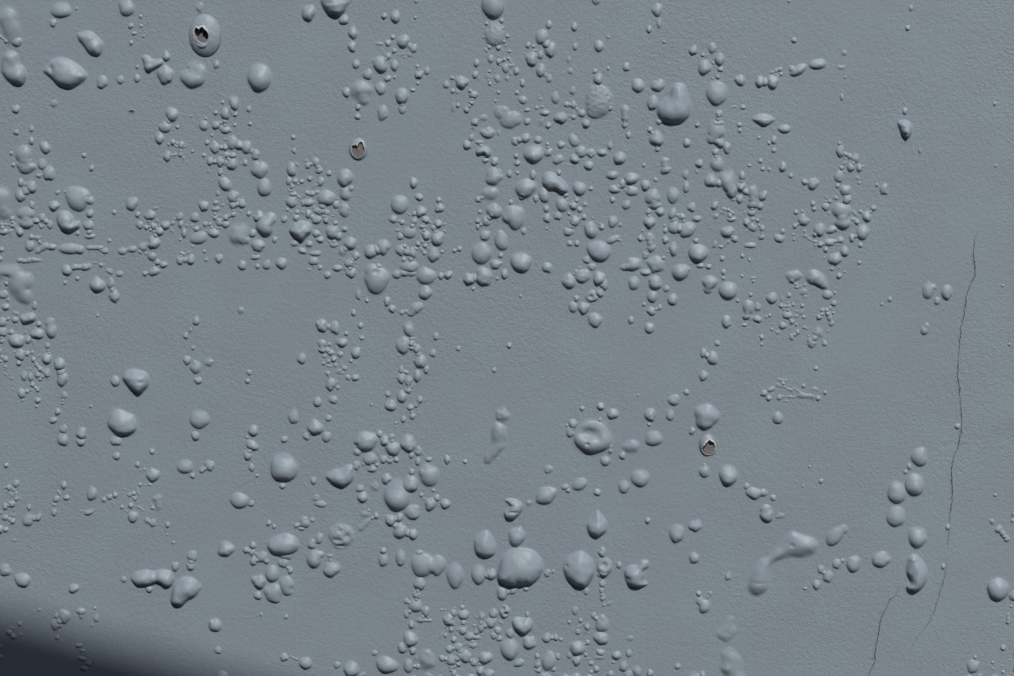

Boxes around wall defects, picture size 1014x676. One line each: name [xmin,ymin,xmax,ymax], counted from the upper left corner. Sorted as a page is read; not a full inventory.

crack [867,585,901,676]
crack [908,233,977,651]